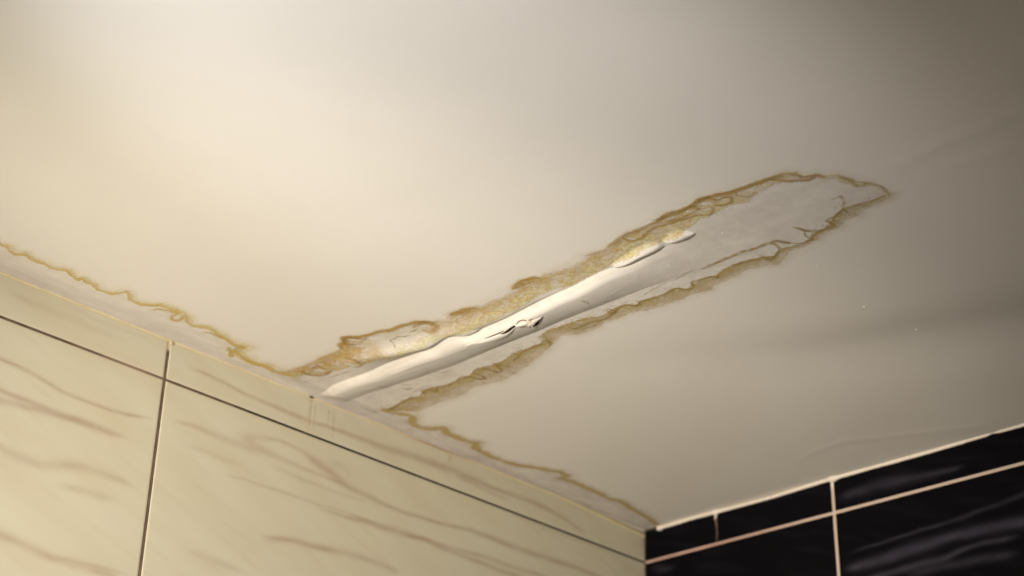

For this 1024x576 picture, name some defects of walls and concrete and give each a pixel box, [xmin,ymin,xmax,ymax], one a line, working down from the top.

leakage [0,172,825,377]
crack [466,317,543,347]
leakage [382,195,886,525]